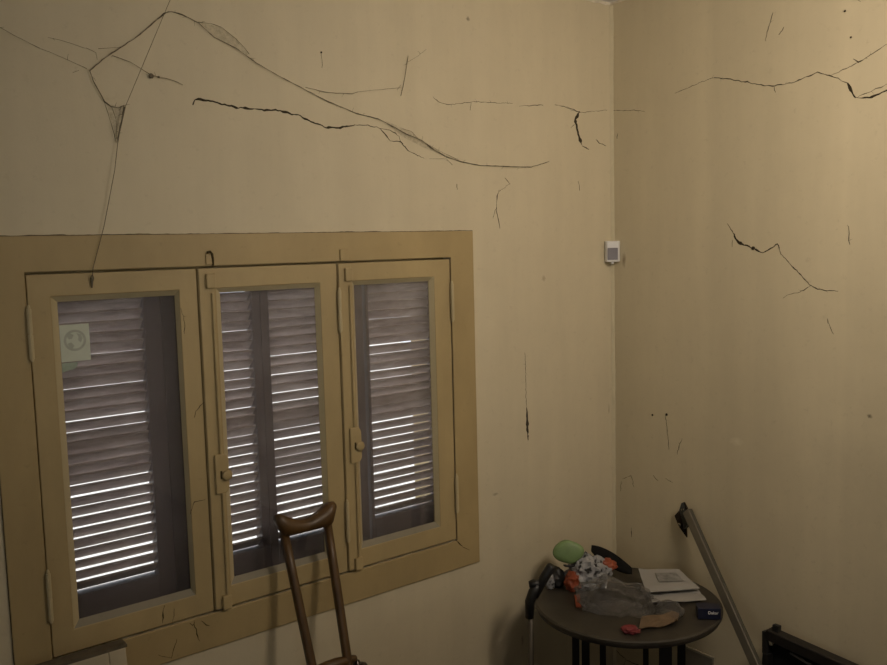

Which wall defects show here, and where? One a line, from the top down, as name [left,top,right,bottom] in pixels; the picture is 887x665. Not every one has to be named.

crack [676,44,887,99]
crack [192,98,423,158]
crack [433,97,641,150]
crack [728,225,835,297]
crack [523,361,531,440]